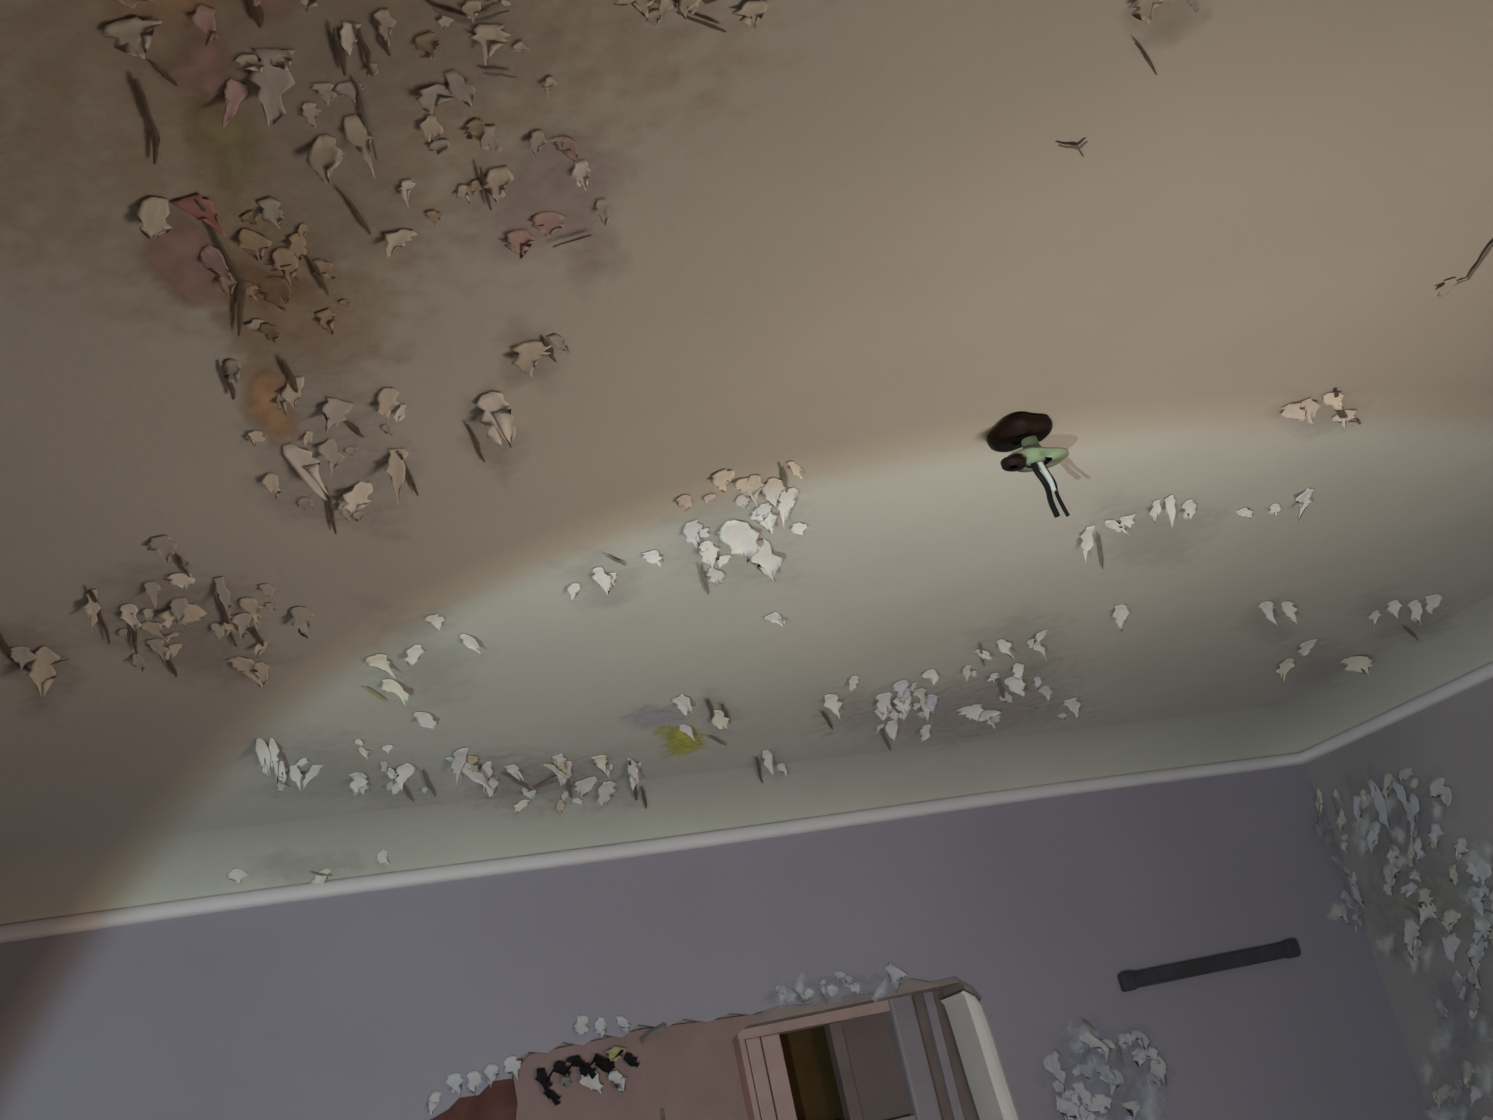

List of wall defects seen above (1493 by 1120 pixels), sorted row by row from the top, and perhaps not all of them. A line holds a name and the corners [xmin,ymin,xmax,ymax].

damp [0,0,500,370]
peeling [222,8,417,257]
peeling [414,0,610,259]
crack [1454,242,1493,286]
peeling [244,359,419,534]
peeling [676,461,808,595]
peeling [83,535,314,690]
peeling [255,738,324,792]
peeling [445,747,647,815]
peeling [821,629,1081,751]
peeling [1315,768,1493,1120]
spalling [427,1013,762,1120]